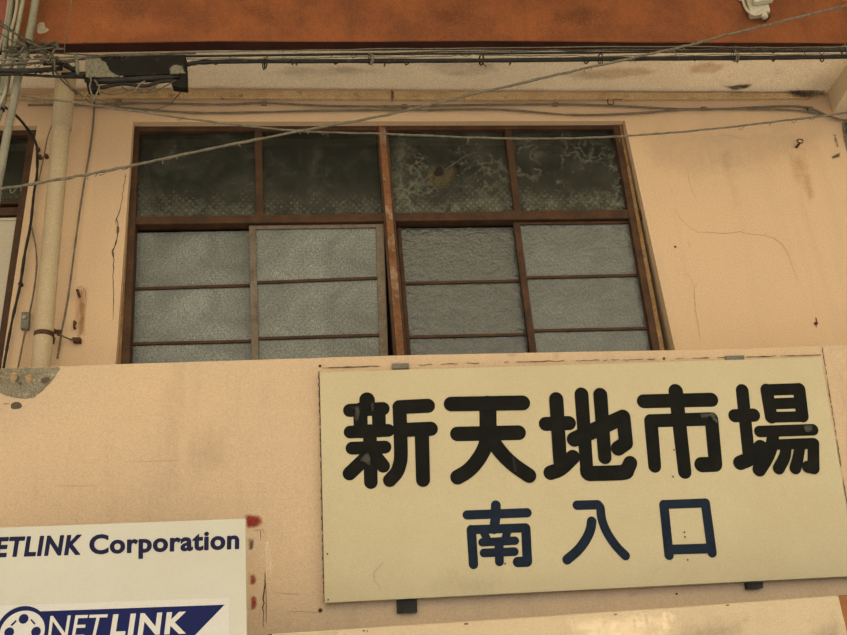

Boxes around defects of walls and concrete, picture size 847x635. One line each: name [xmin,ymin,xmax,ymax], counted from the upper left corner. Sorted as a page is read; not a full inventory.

crack [112,174,126,320]
flaking render [0,367,60,409]